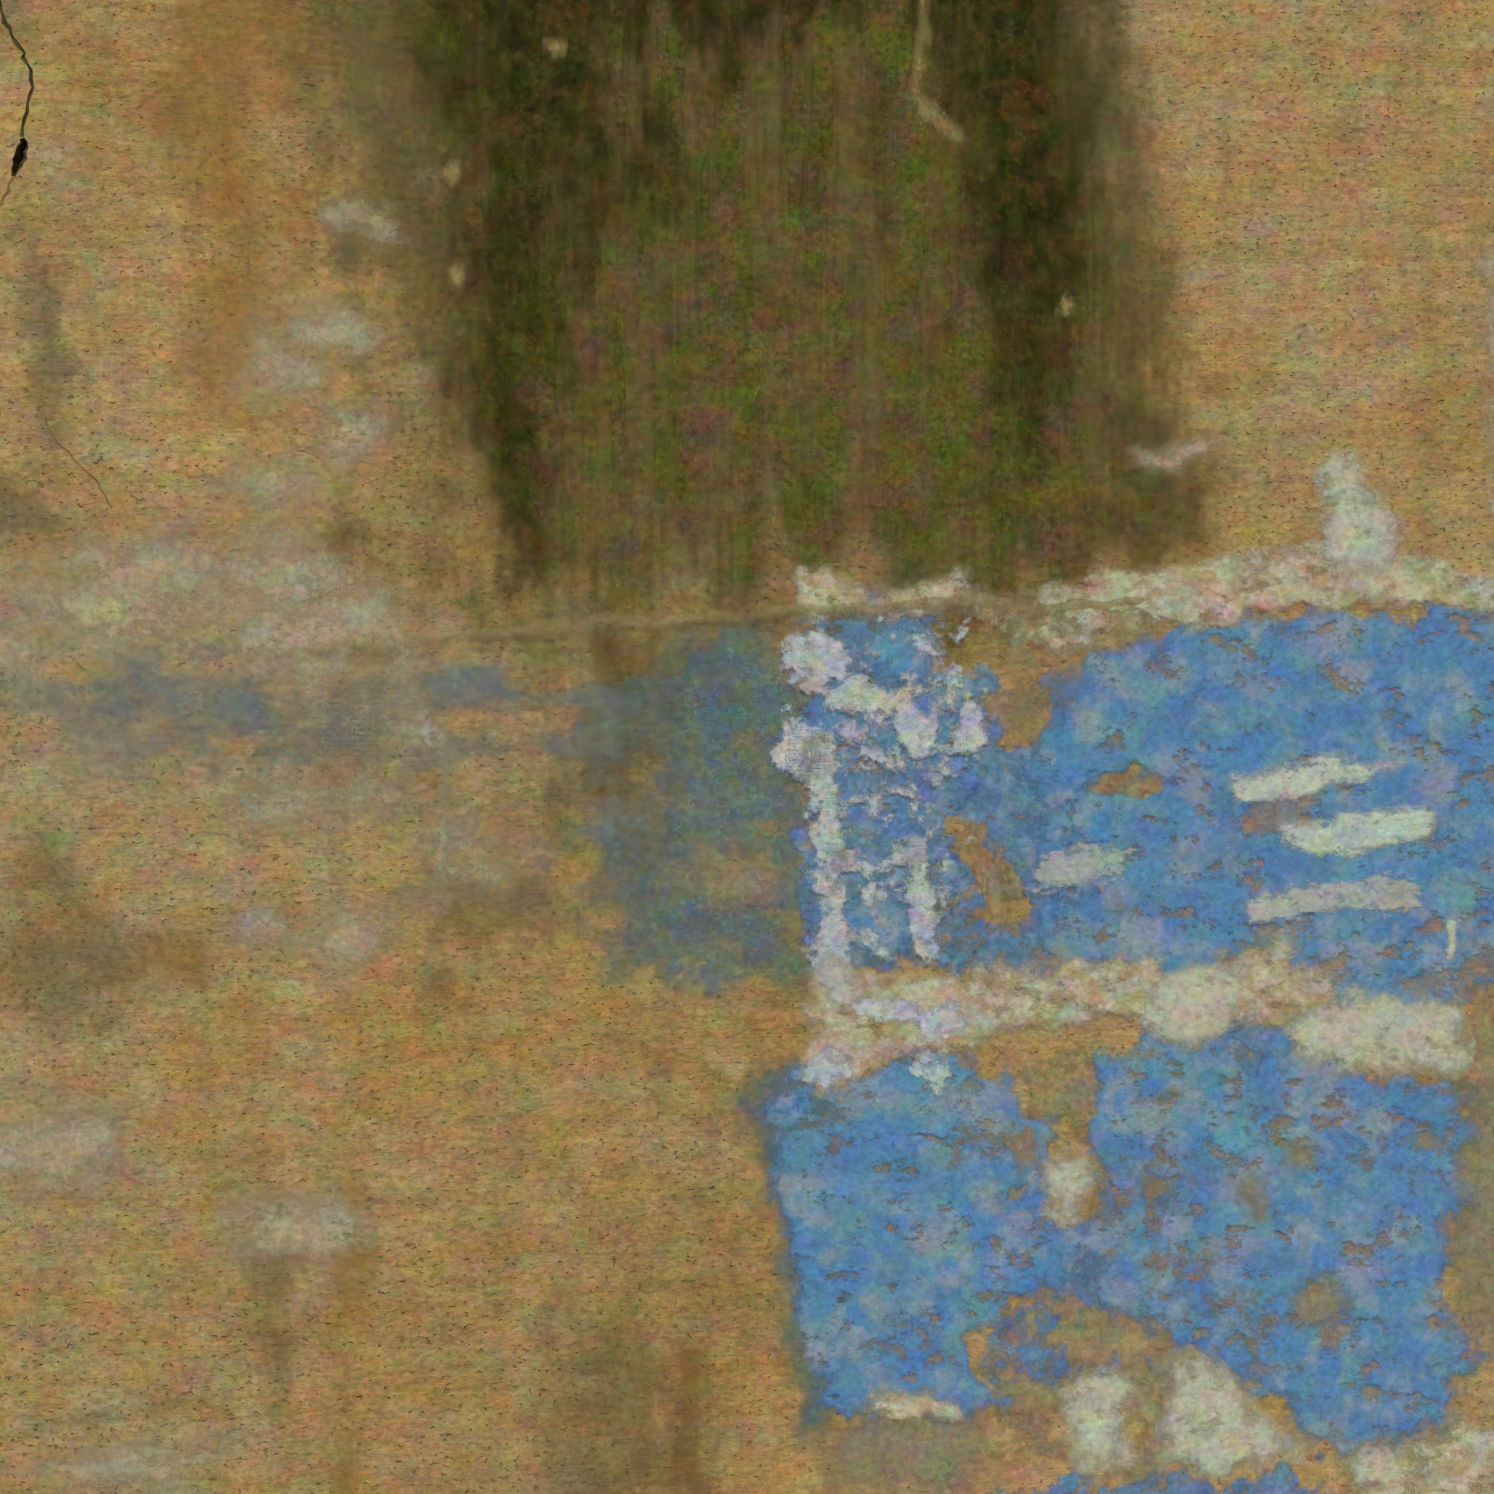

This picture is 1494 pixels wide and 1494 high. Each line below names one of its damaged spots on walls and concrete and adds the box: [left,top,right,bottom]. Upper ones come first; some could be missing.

crack [0,0,34,207]
water stain [252,305,370,391]
water stain [321,201,395,239]
water stain [443,0,626,527]
water stain [913,0,1096,425]
crack [45,418,113,508]
water stain [1139,439,1211,469]
peeling [740,590,1494,1494]